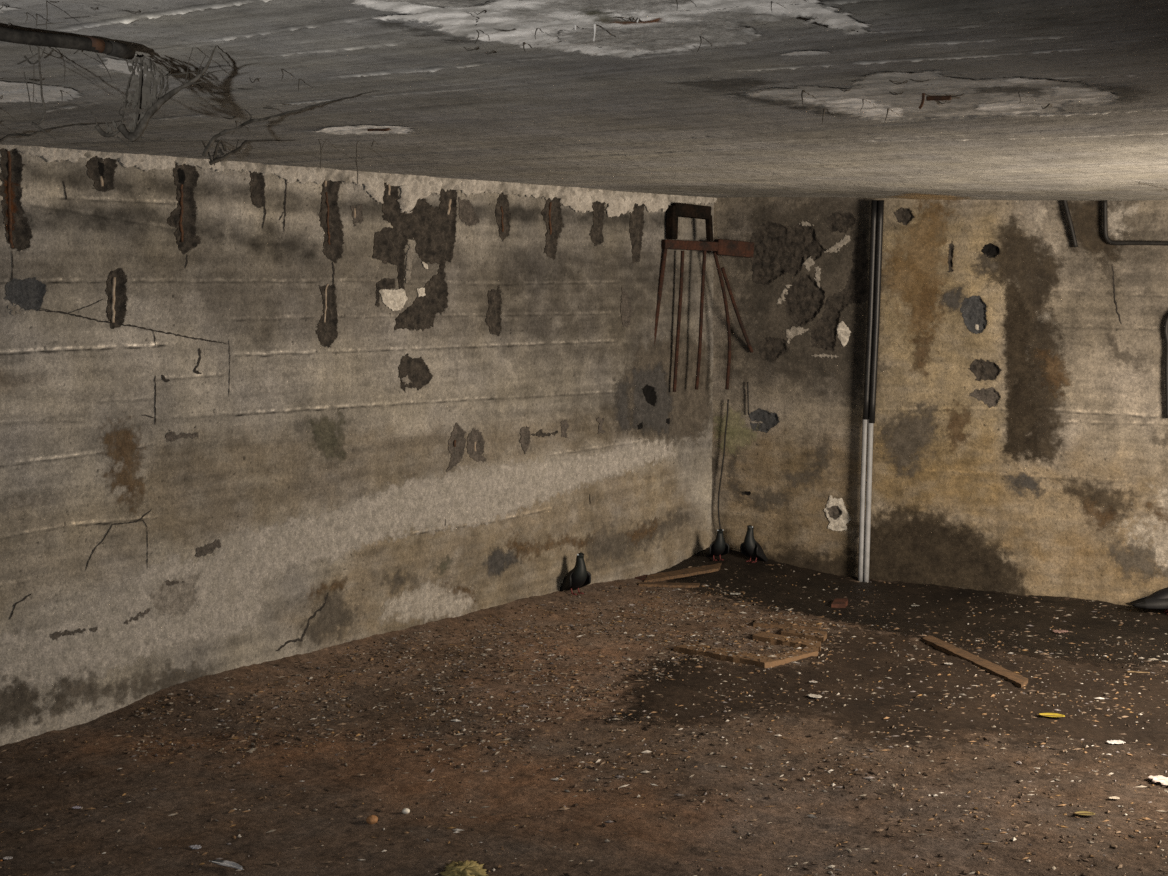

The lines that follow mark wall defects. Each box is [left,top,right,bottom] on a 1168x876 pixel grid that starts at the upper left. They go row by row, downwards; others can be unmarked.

spalling [0,148,66,316]
spalling [106,268,128,329]
spalling [166,163,200,268]
spalling [316,180,363,348]
spalling [372,182,480,331]
spalling [495,192,511,241]
water stain [984,200,1147,463]
crack [85,509,152,571]
water stain [0,338,828,746]
water stain [1006,473,1040,496]
water stain [1064,480,1168,579]
water stain [602,506,1168,754]